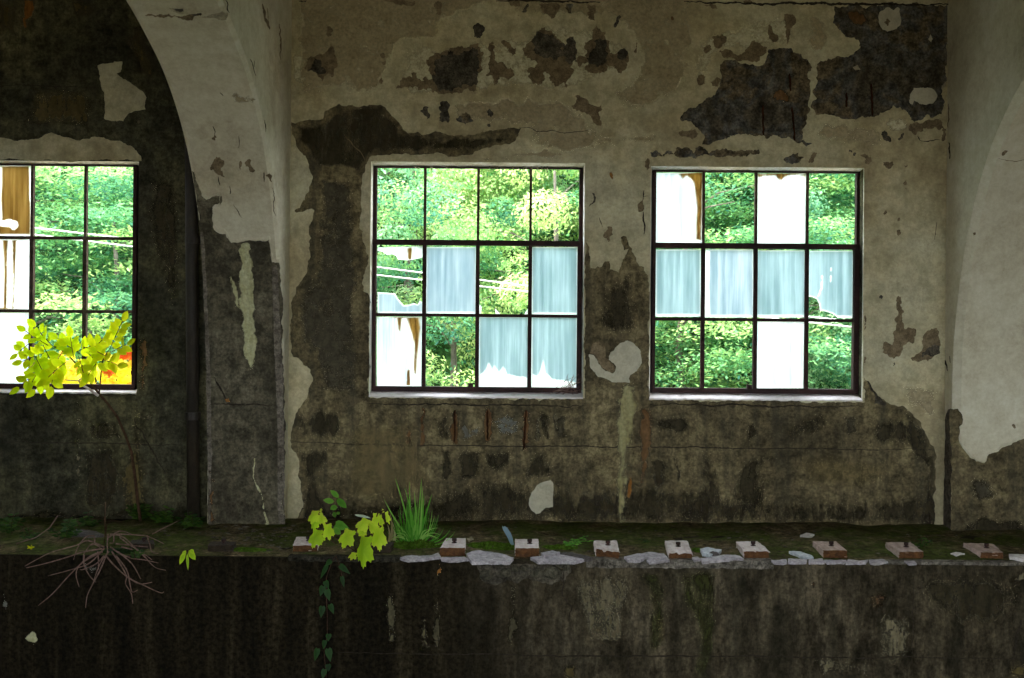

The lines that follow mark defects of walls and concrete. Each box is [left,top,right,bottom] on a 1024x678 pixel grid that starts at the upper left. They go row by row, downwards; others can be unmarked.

spalling [192,1,1024,531]
water stain [297,450,341,519]
water stain [300,411,339,437]
water stain [353,385,935,525]